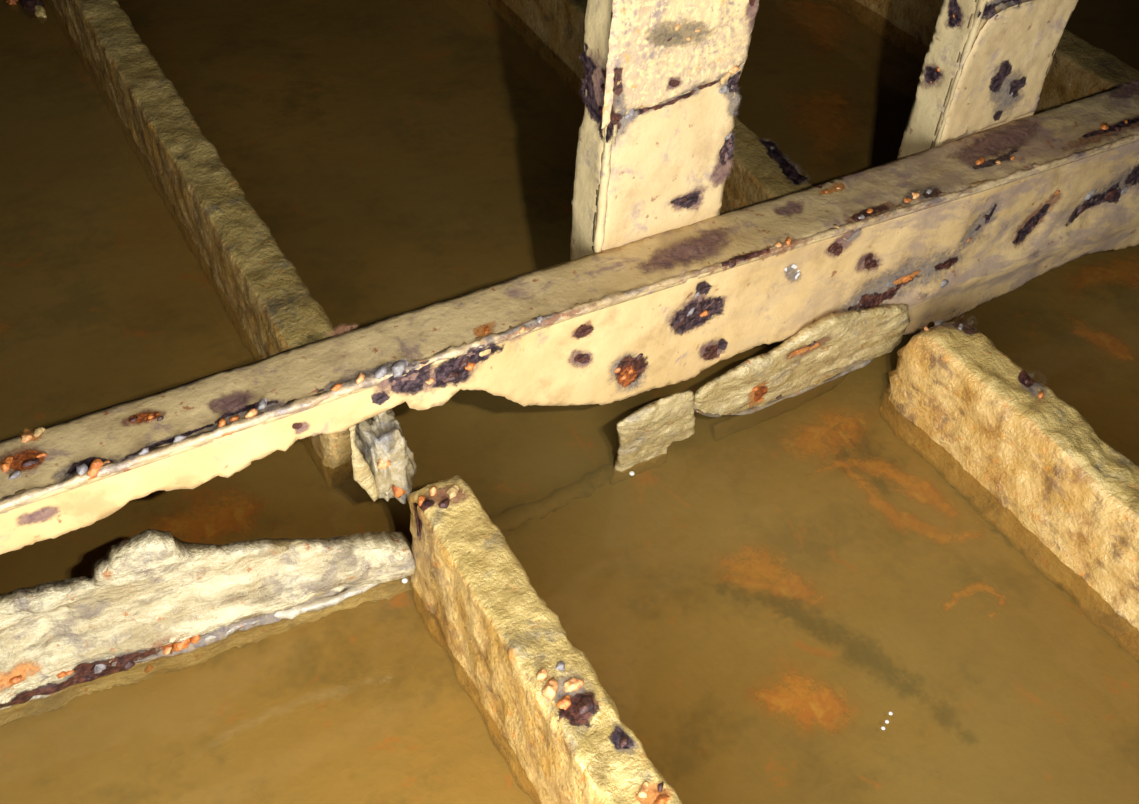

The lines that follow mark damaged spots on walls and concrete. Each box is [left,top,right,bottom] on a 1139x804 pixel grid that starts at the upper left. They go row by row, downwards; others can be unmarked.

corrosion [947,0,964,27]
corrosion [579,44,638,143]
corrosion [953,60,1037,170]
corrosion [671,132,734,210]
corrosion [319,304,594,405]
spalling [569,321,594,367]
spalling [615,356,648,384]
spalling [703,339,728,360]
corrosion [53,391,284,482]
corrosion [0,589,346,708]
corrosion [537,661,599,728]
corrosion [609,726,637,753]